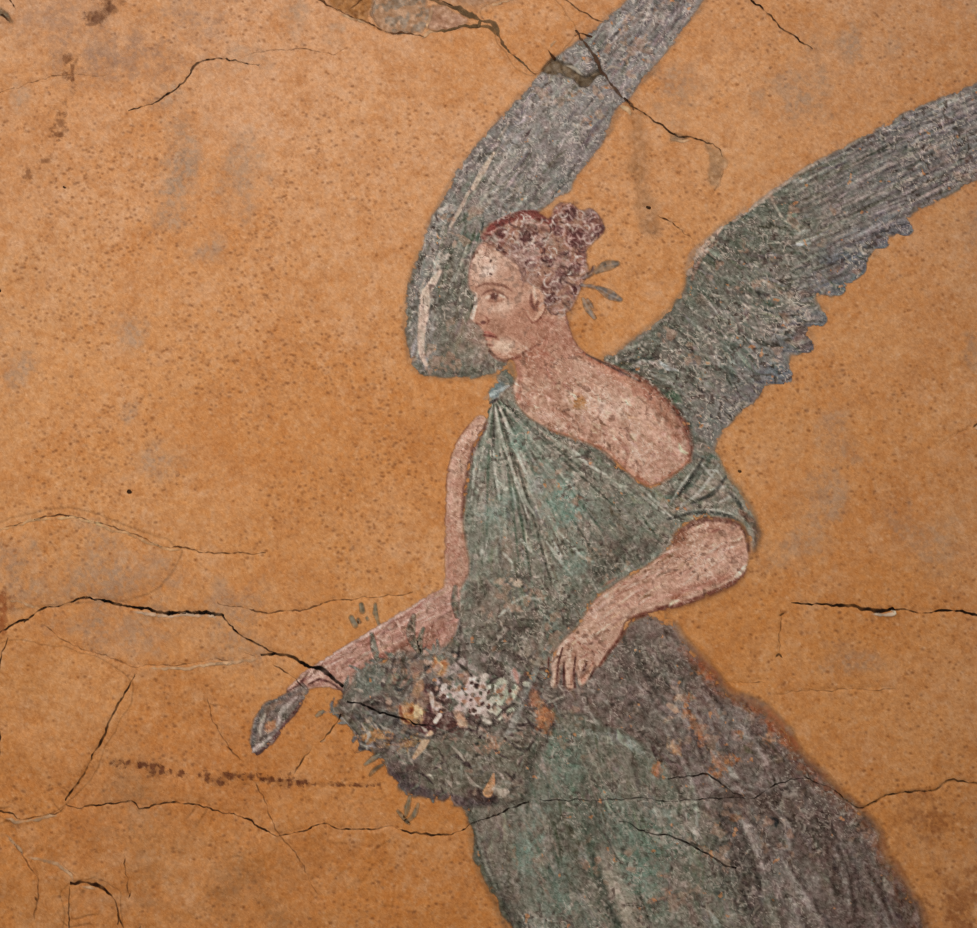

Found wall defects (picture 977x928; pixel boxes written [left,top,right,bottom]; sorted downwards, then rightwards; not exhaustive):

spalling [330,0,467,35]
crack [320,0,530,70]
crack [549,3,710,144]
crack [14,514,241,554]
crack [780,602,977,627]
crack [0,596,426,741]
crack [0,684,374,927]
crack [486,799,583,819]
crack [611,773,814,802]
crack [839,778,966,808]
crack [401,828,465,836]
crack [633,825,737,869]